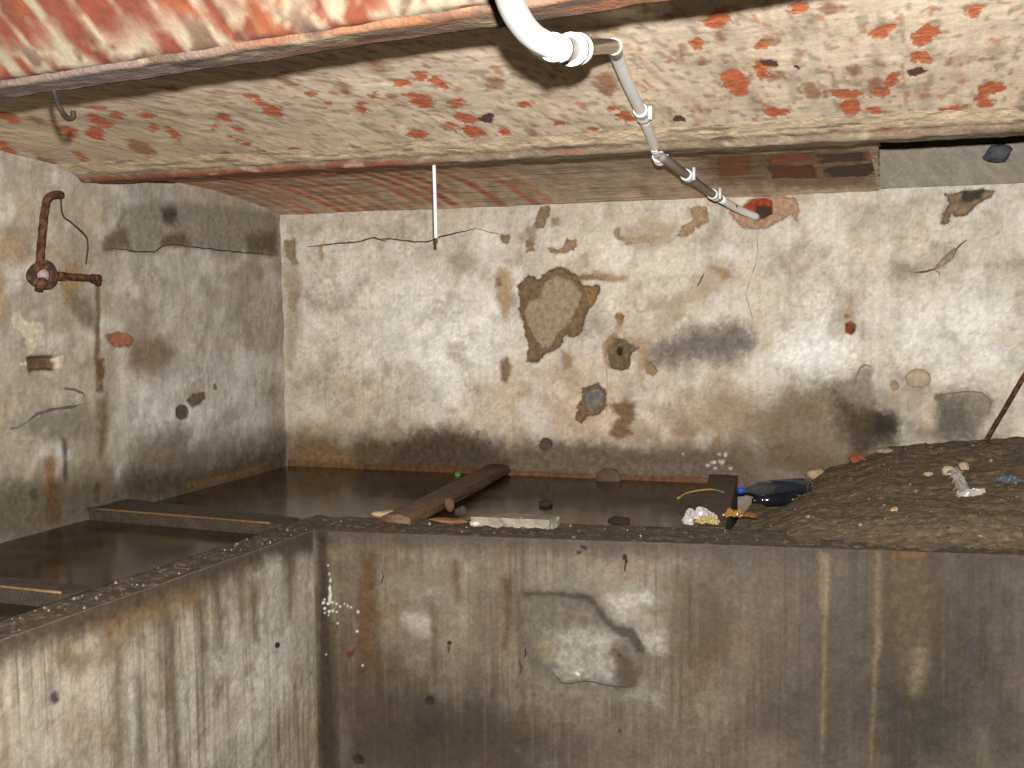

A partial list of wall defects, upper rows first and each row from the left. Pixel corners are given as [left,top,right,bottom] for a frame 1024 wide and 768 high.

flaking render [941,189,994,225]
crack [307,228,503,259]
crack [896,240,967,277]
peeling [104,205,300,364]
flaking render [517,267,607,363]
corrosion [62,266,106,455]
flaking render [603,333,639,370]
crack [10,387,86,434]
damp [611,402,634,438]
damp [934,391,993,441]
damp [0,429,747,531]
damp [0,531,338,768]